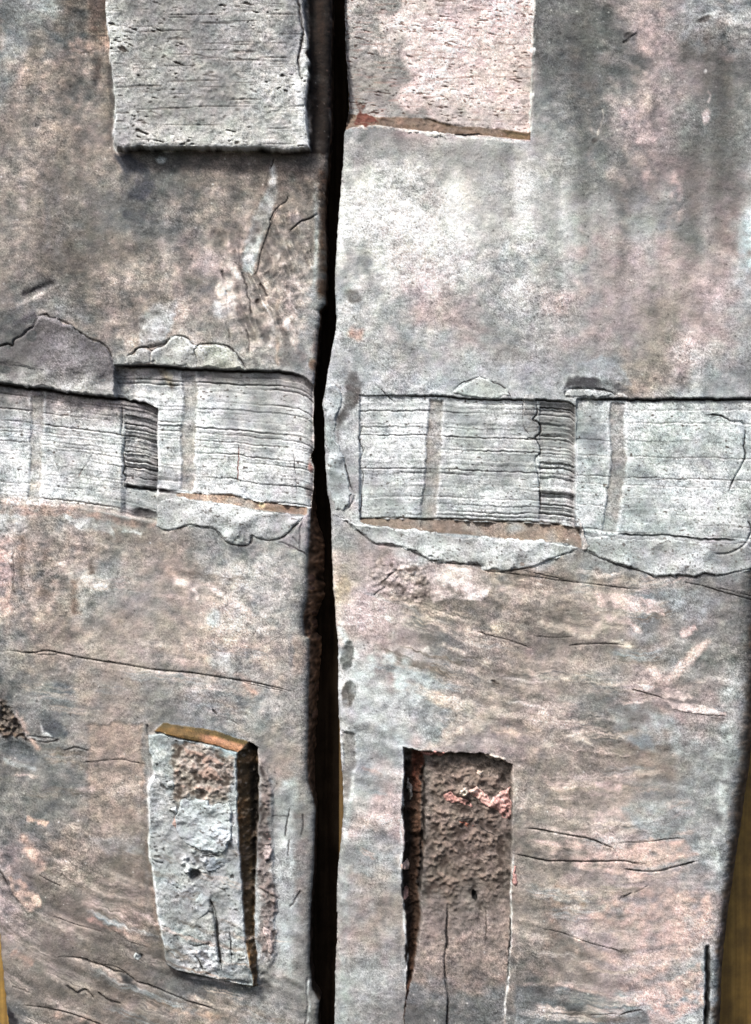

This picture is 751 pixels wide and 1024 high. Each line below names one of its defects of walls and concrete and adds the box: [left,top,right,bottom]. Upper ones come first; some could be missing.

water stain [551,30,614,110]
corrosion [354,99,379,128]
water stain [625,0,751,228]
crack [255,196,318,276]
water stain [736,206,751,281]
water stain [641,283,665,318]
peeling [323,384,751,579]
crack [0,650,292,692]
spalling [167,740,238,873]
spalling [253,755,280,974]
spalling [400,751,518,915]
crack [512,828,695,898]